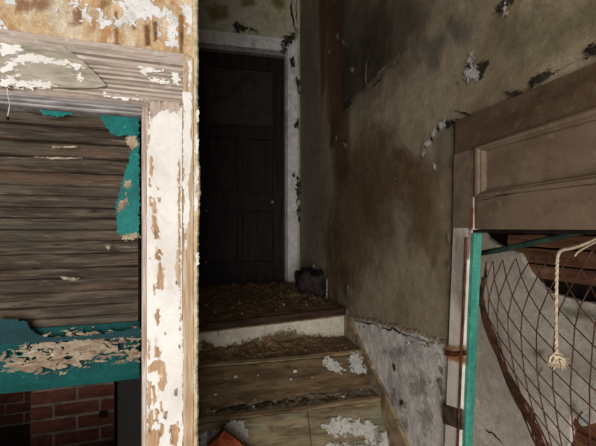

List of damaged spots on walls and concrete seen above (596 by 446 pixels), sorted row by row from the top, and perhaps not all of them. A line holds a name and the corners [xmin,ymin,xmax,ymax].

peeling [495,0,514,16]
spalling [231,20,259,34]
peeling [280,31,297,69]
spalling [584,42,596,60]
peeling [456,52,489,86]
spalling [504,68,556,98]
peeling [420,118,459,162]
peeling [292,172,301,222]
spalling [54,0,250,446]
spalling [507,234,596,286]
crack [354,320,441,345]